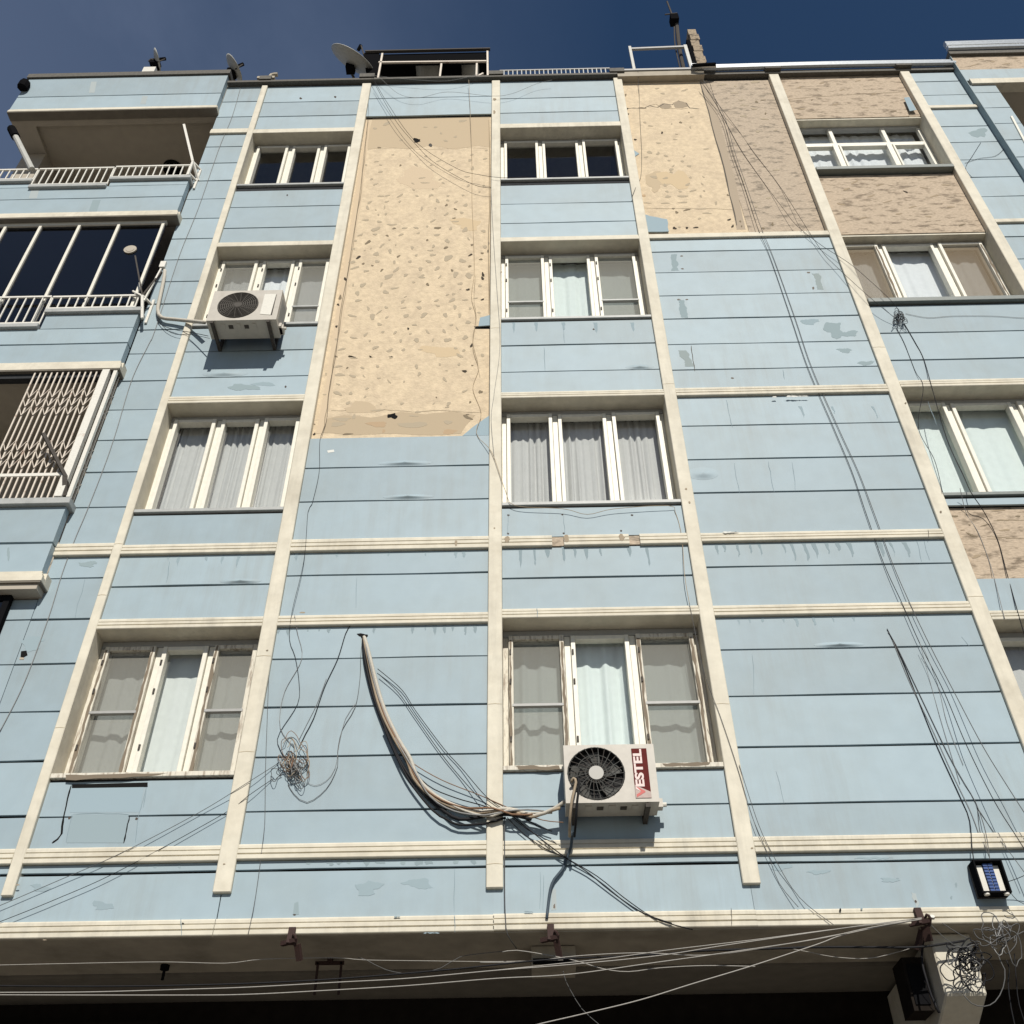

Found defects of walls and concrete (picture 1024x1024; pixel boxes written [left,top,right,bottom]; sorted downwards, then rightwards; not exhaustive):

peeling [890,97,920,117]
peeling [634,80,746,233]
peeling [334,126,490,378]
spalling [314,390,489,436]
damp [518,546,602,568]